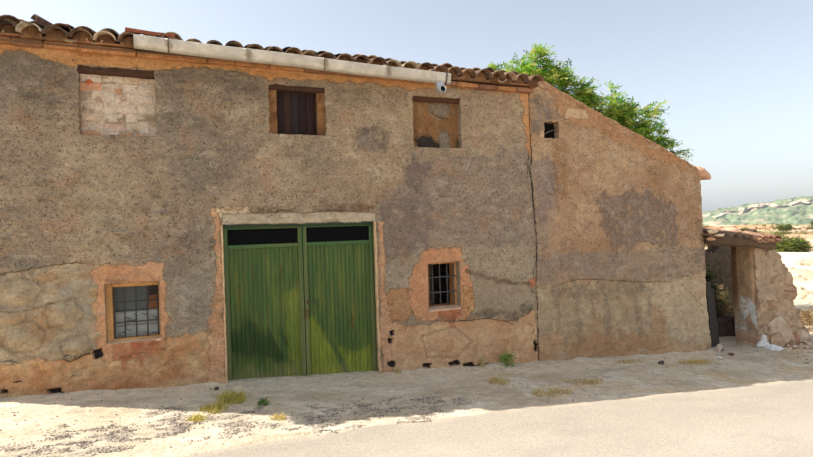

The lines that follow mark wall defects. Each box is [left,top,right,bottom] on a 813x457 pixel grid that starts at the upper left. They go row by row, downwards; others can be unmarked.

peeling [0,44,436,91]
peeling [0,203,250,397]
peeling [377,221,539,373]
crack [440,94,702,361]